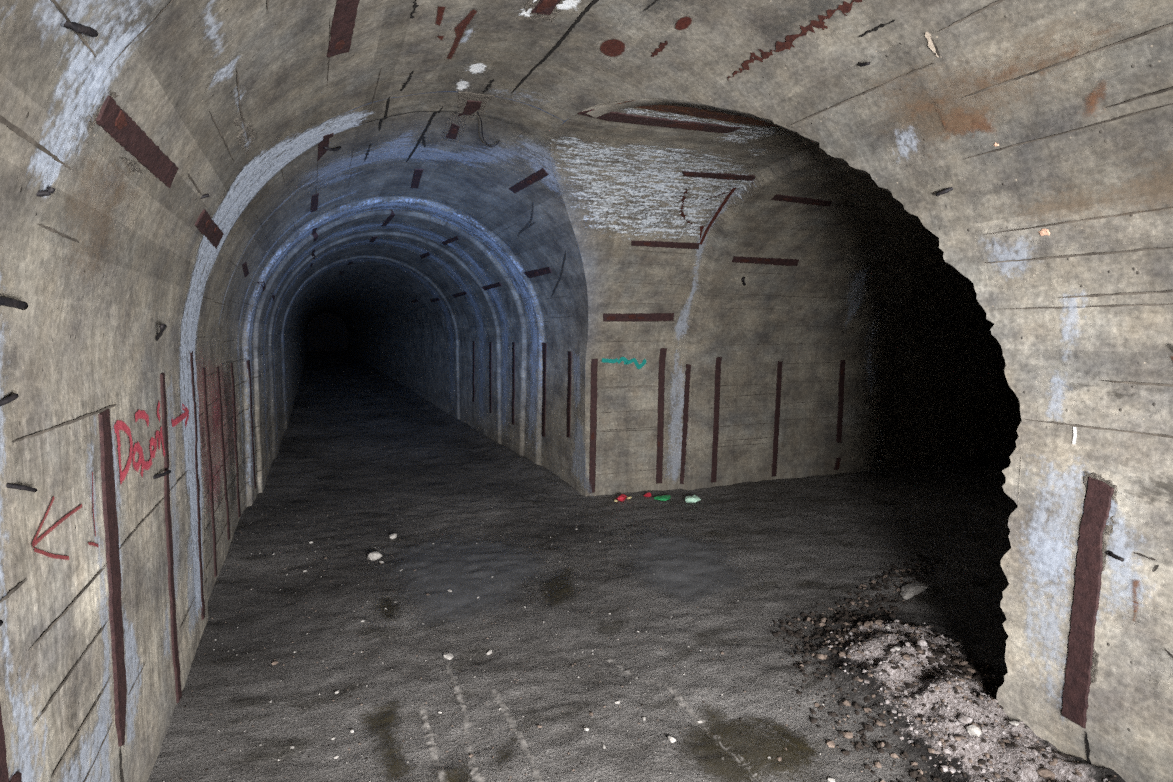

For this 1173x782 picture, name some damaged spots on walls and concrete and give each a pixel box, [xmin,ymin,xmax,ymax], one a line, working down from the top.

water stain [29,0,145,190]
water stain [622,108,775,155]
water stain [524,137,754,256]
water stain [676,284,696,339]
crack [1134,553,1159,572]